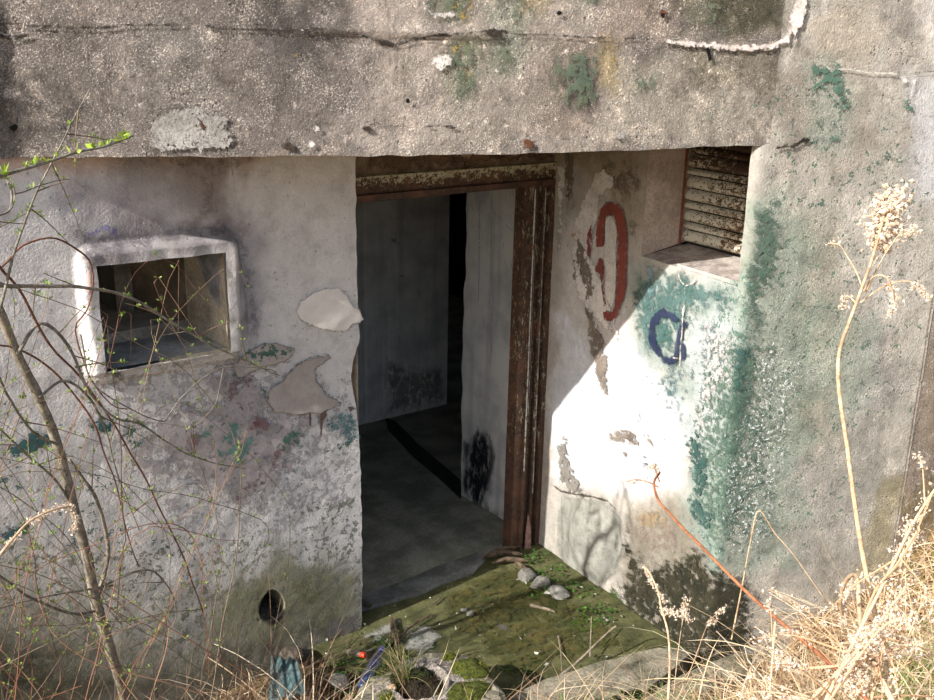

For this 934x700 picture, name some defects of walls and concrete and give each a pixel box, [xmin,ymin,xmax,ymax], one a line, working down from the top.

crack [0,0,934,75]
leakage [704,0,781,33]
spalling [149,105,233,153]
corrosion [369,153,553,172]
crack [776,137,810,149]
peeling [557,166,619,395]
peeling [297,288,363,331]
peeling [9,432,52,457]
peeling [88,418,113,433]
peeling [122,343,361,507]
peeling [0,523,30,541]
leakage [617,525,760,661]